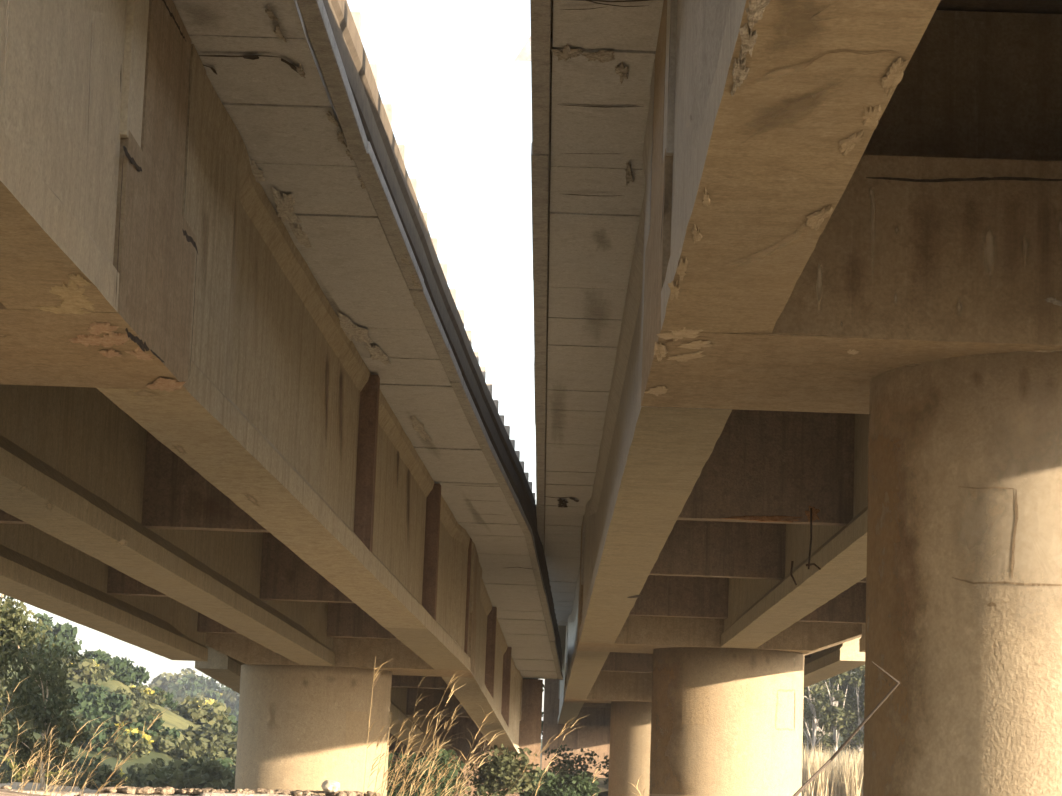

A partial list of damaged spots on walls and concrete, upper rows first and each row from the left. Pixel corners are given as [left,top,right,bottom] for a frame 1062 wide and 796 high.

spalling [839,57,908,156]
crack [866,175,1062,183]
spalling [37,274,155,360]
spalling [654,327,714,362]
spalling [716,506,821,585]
crack [952,486,1062,607]